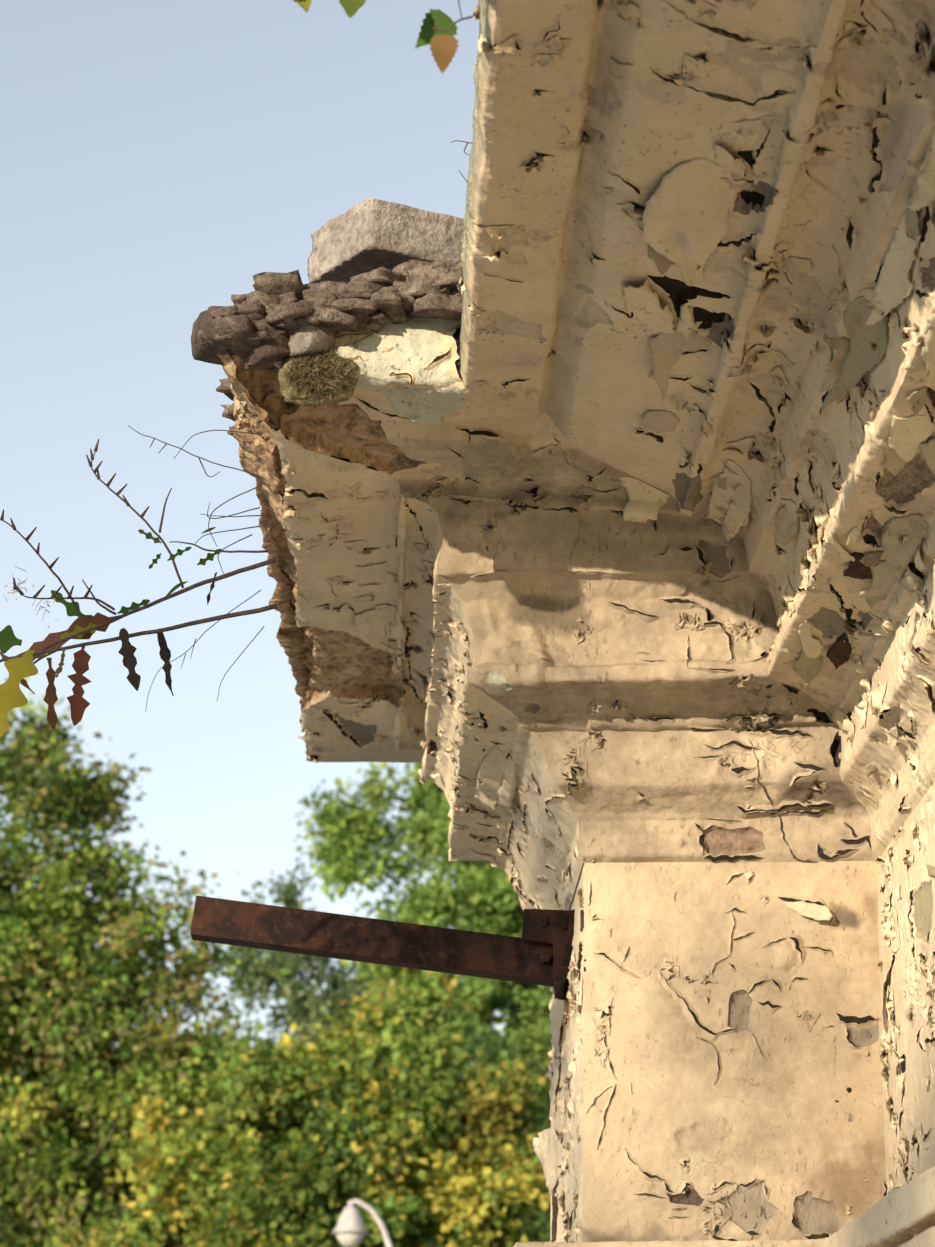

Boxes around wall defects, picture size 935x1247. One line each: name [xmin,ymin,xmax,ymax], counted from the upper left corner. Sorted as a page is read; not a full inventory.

crack [349,320,463,422]
peeling [571,101,853,444]
crack [284,486,340,548]
spalling [217,317,540,909]
crack [295,341,890,910]
crack [917,675,935,715]
crack [555,998,761,1243]
spalling [694,817,766,885]
spalling [662,1154,852,1240]
crack [593,683,935,1225]
peeling [760,895,836,924]
peeling [794,819,935,1195]